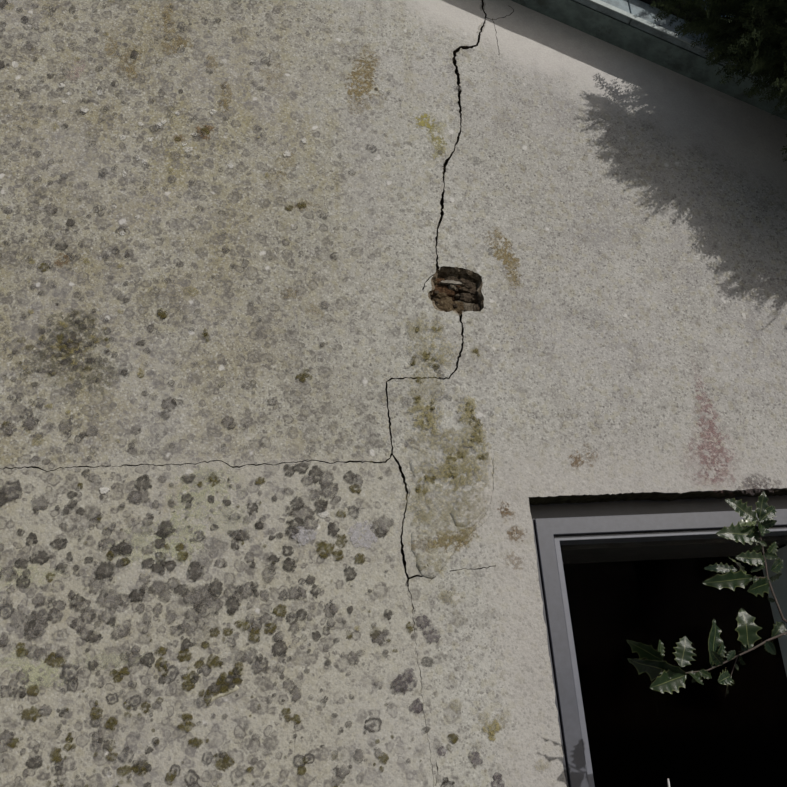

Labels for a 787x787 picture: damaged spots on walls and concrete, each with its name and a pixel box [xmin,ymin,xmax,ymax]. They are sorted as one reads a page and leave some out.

crack [422,0,514,290]
spalling [428,266,484,316]
crack [0,313,494,787]